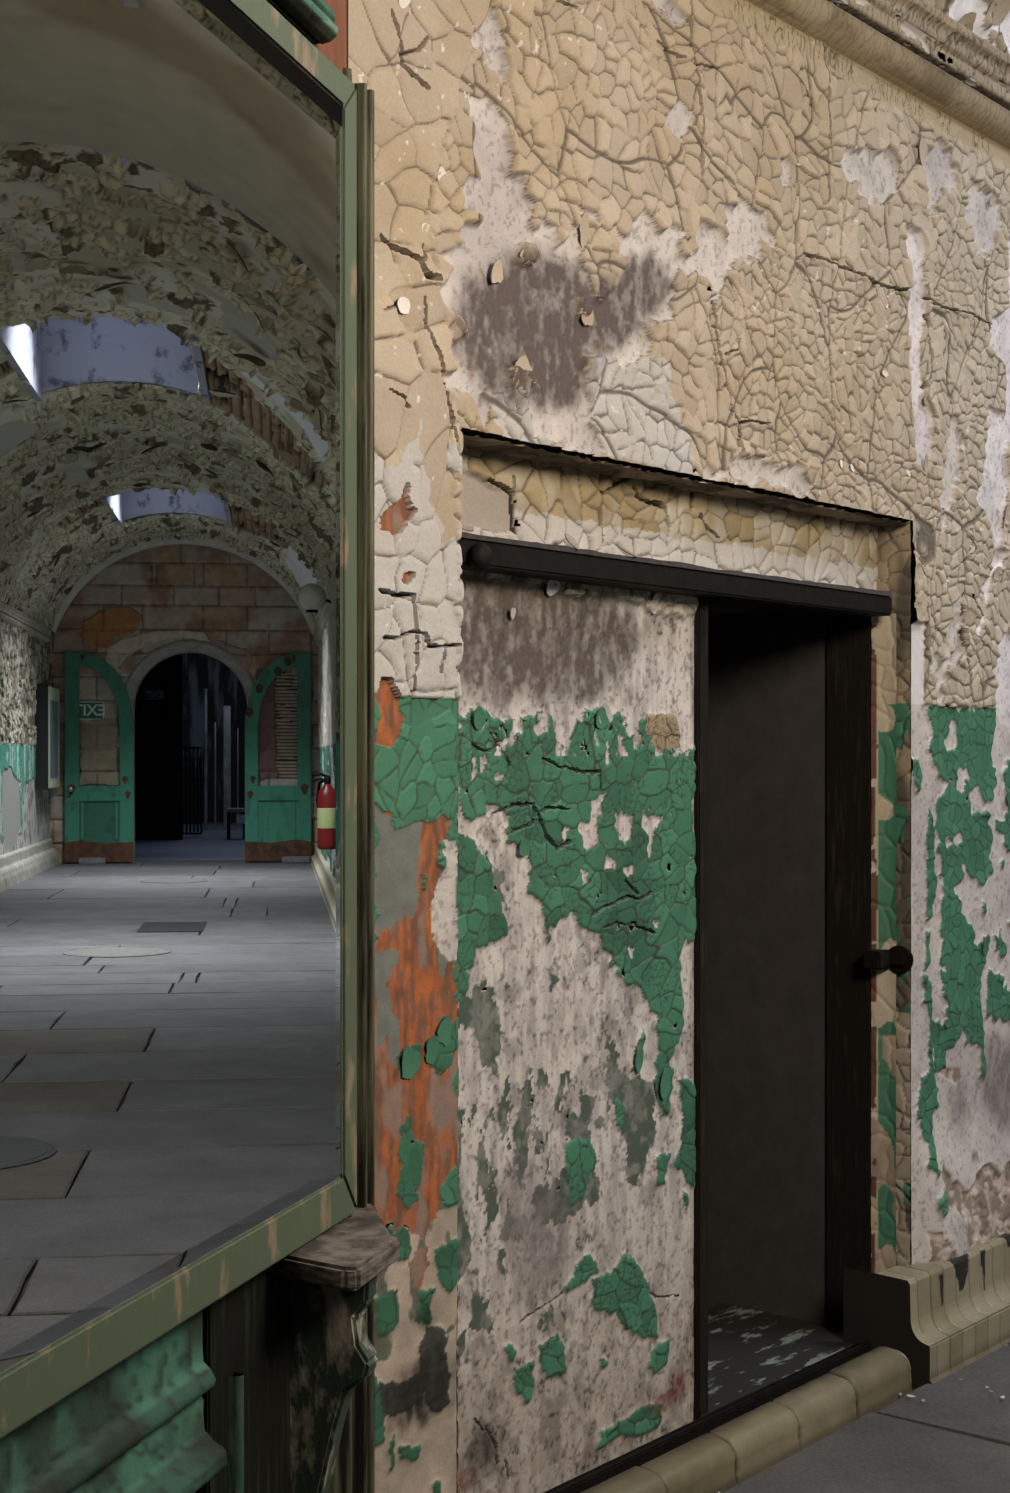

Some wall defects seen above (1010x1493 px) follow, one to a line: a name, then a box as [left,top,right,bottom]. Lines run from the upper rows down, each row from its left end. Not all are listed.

crack [391,8,431,90]
peeling [949,0,1010,53]
crack [379,233,459,442]
peeling [440,93,778,457]
crack [789,252,992,389]
crack [487,475,518,534]
peeling [703,454,813,498]
rust [375,676,405,746]
crack [378,588,462,692]
peeling [905,137,1010,1264]
rust [375,802,459,1288]
peeling [375,570,695,1493]